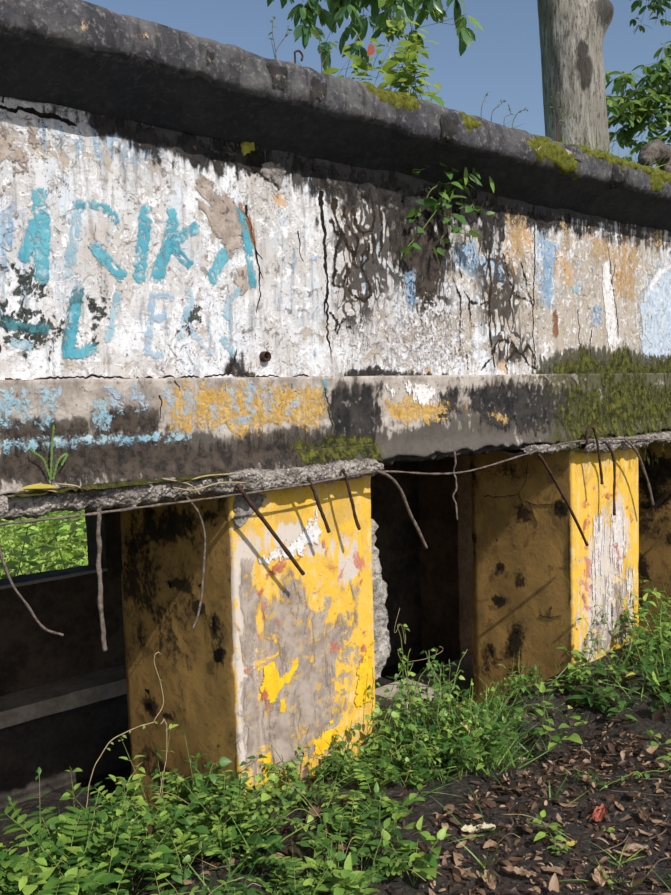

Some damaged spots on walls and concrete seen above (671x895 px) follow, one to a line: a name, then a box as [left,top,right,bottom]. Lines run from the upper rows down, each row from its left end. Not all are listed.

crack [0,96,77,127]
peeling [193,174,248,295]
crack [245,205,263,313]
leakage [93,114,592,321]
crack [318,190,384,355]
crack [5,349,333,433]
leakage [0,365,447,493]
leakage [124,495,228,574]
leakage [638,447,671,536]
leakage [214,648,223,663]
peeling [0,426,671,783]